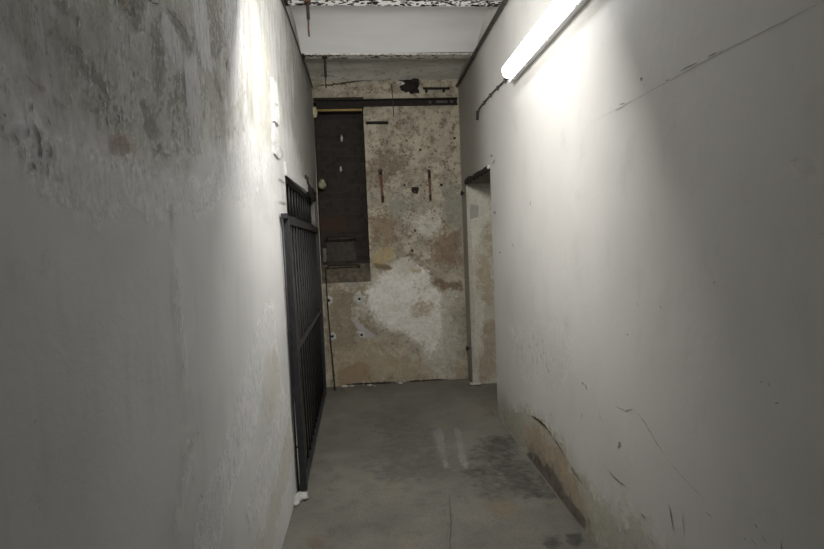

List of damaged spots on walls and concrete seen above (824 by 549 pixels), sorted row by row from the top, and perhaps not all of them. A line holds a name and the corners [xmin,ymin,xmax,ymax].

peeling [50,0,266,153]
crack [591,1,823,123]
damp [408,183,463,290]
damp [323,283,464,386]
damp [465,407,605,541]